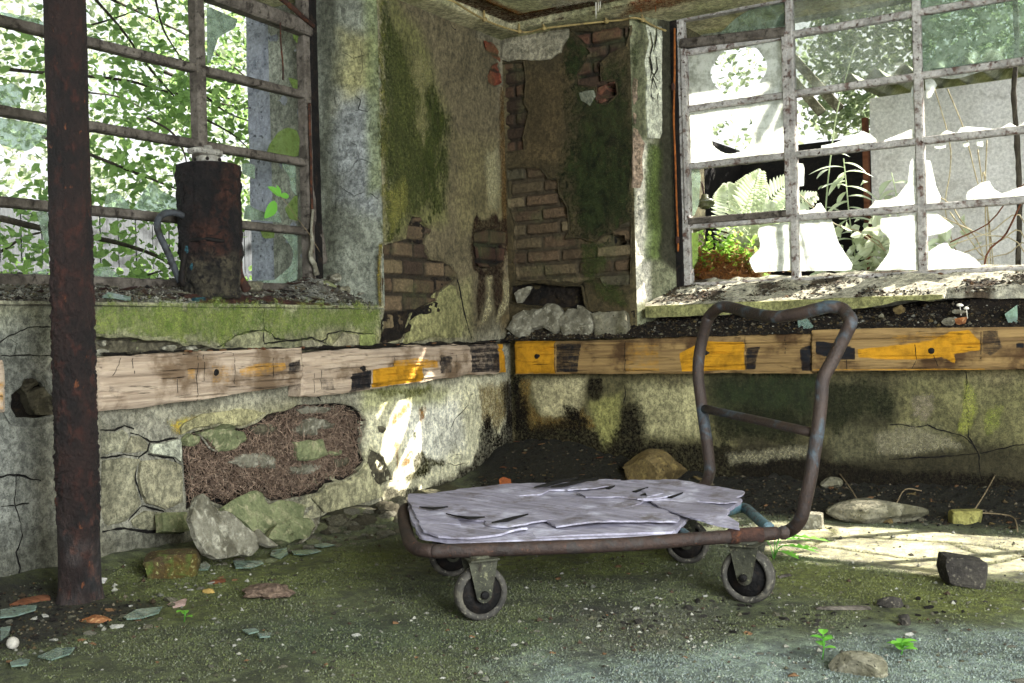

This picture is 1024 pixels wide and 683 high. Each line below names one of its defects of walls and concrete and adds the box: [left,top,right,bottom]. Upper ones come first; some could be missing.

damp [378,0,452,242]
spalling [482,25,632,154]
damp [558,28,661,306]
crack [217,308,374,347]
spalling [249,214,458,344]
spalling [482,167,632,323]
crack [0,473,41,574]
crack [100,425,185,534]
spalling [178,399,393,512]
damp [384,373,815,500]
damp [817,459,1024,490]
crack [889,372,1024,479]